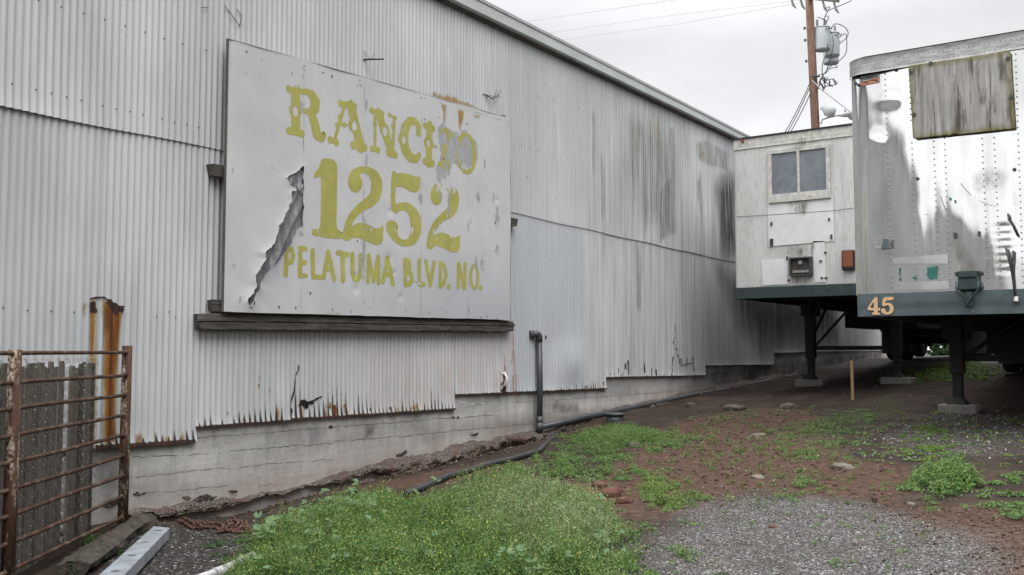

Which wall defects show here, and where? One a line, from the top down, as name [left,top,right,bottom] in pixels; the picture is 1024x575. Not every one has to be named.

rust [434,93,473,125]
damp [721,183,734,249]
damp [738,299,833,337]
rust [84,296,774,449]